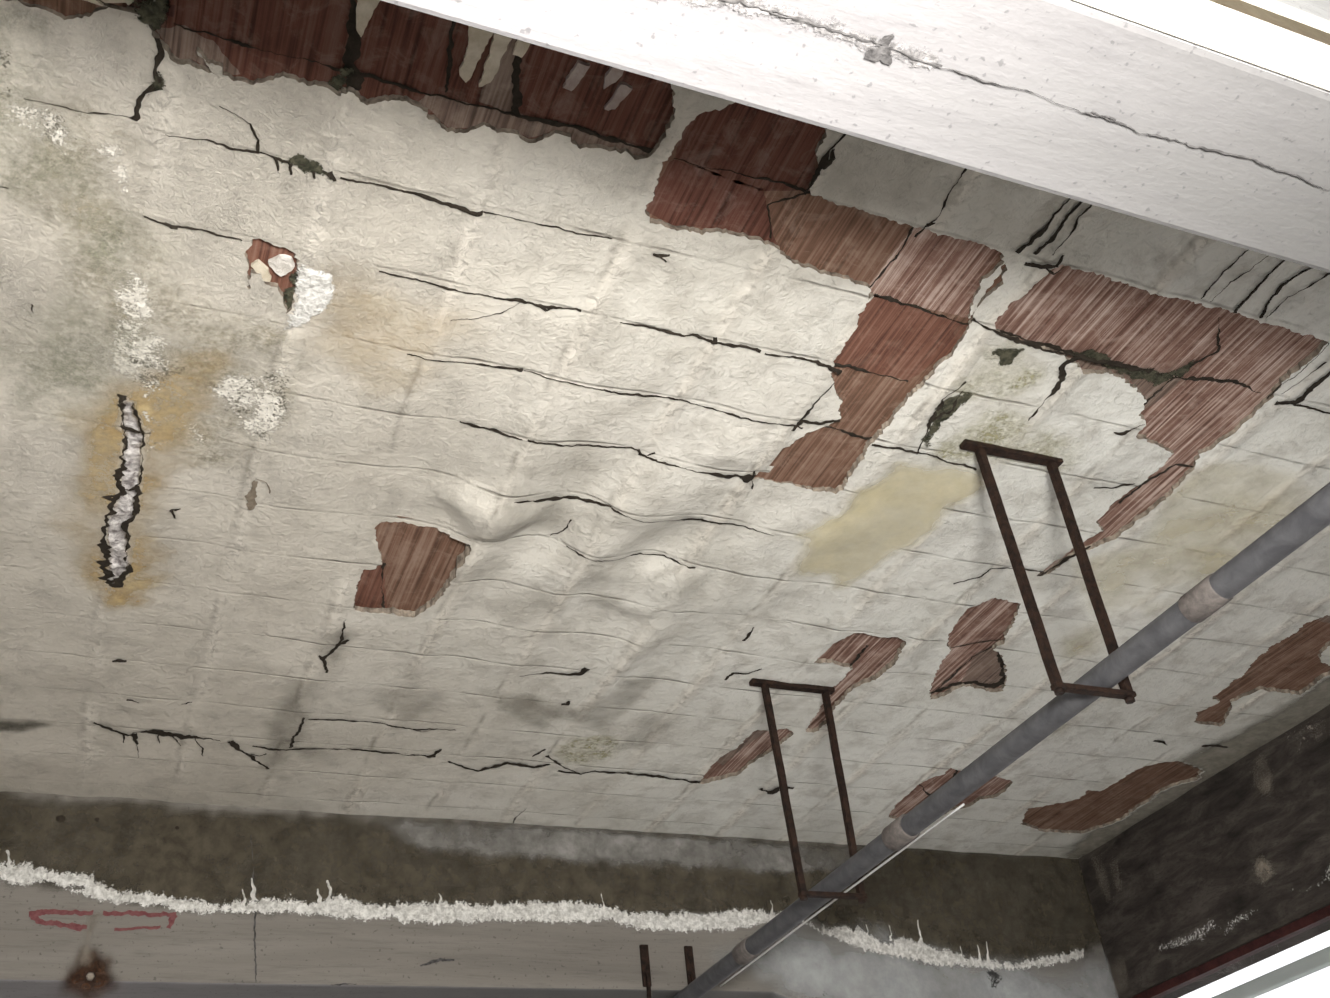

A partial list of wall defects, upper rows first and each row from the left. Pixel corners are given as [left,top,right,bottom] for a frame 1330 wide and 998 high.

crack [23,0,127,16]
flaking render [85,0,1006,489]
crack [914,168,967,237]
rust [84,374,198,506]
water stain [978,415,1010,444]
flaking render [995,265,1323,570]
water stain [802,446,979,579]
rust [87,539,153,606]
flaking render [354,516,466,611]
crack [525,667,590,705]
flaking render [930,598,1018,695]
crack [94,699,701,783]